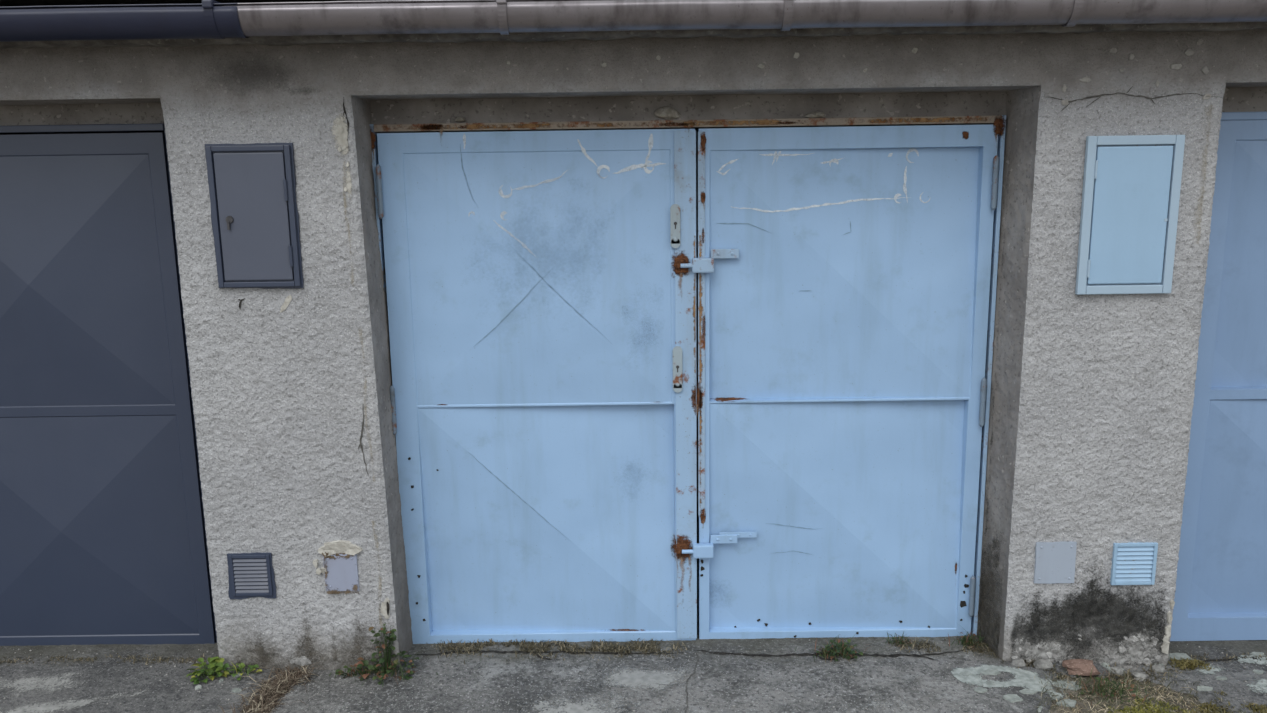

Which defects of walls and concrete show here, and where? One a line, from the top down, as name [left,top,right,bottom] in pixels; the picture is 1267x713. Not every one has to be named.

crack [1049,86,1218,112]
rust [370,123,564,155]
rust [641,120,803,152]
rust [869,117,1006,139]
rust [671,229,746,484]
spalling [313,540,363,574]
rust [671,535,693,577]
water stain [977,502,1166,665]